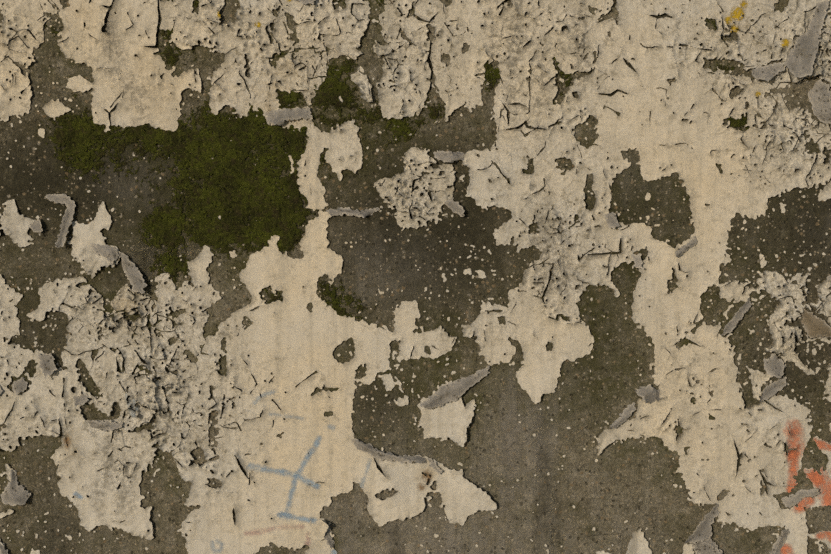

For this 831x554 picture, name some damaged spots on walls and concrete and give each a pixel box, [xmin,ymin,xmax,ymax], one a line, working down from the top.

crack [145,0,162,48]
crack [597,0,618,25]
crack [650,12,672,20]
crack [503,103,545,130]
crack [598,89,627,97]
peeling [699,0,831,164]
peeling [0,0,278,395]
peeling [218,0,789,554]
peeling [73,348,123,432]
peeling [675,183,831,554]
peeling [190,410,220,465]
peeling [0,416,201,554]